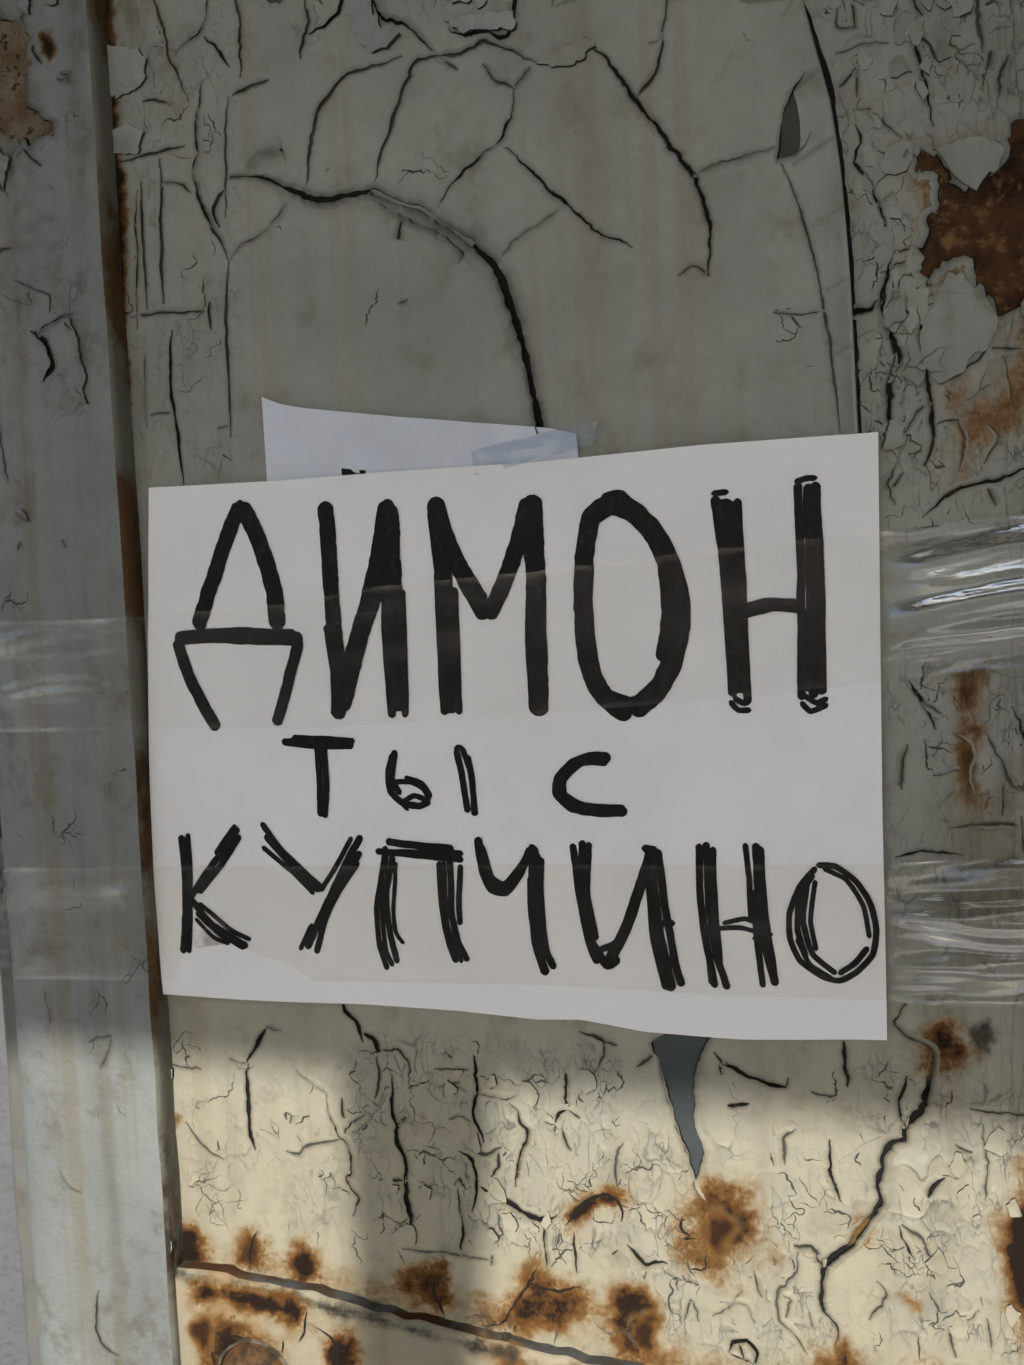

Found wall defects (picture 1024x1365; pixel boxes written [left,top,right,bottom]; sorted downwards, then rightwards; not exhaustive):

peeling [0,147,12,190]
crack [105,0,634,486]
peeling [773,71,812,165]
crack [589,0,1024,530]
corrosion [903,111,1024,326]
crack [17,810,84,911]
peeling [646,1033,716,1182]
corrosion [188,1229,339,1365]
corrosion [474,1259,682,1365]
crack [173,1000,1024,1365]
corrosion [675,1178,759,1281]
corrosion [996,1168,1024,1336]